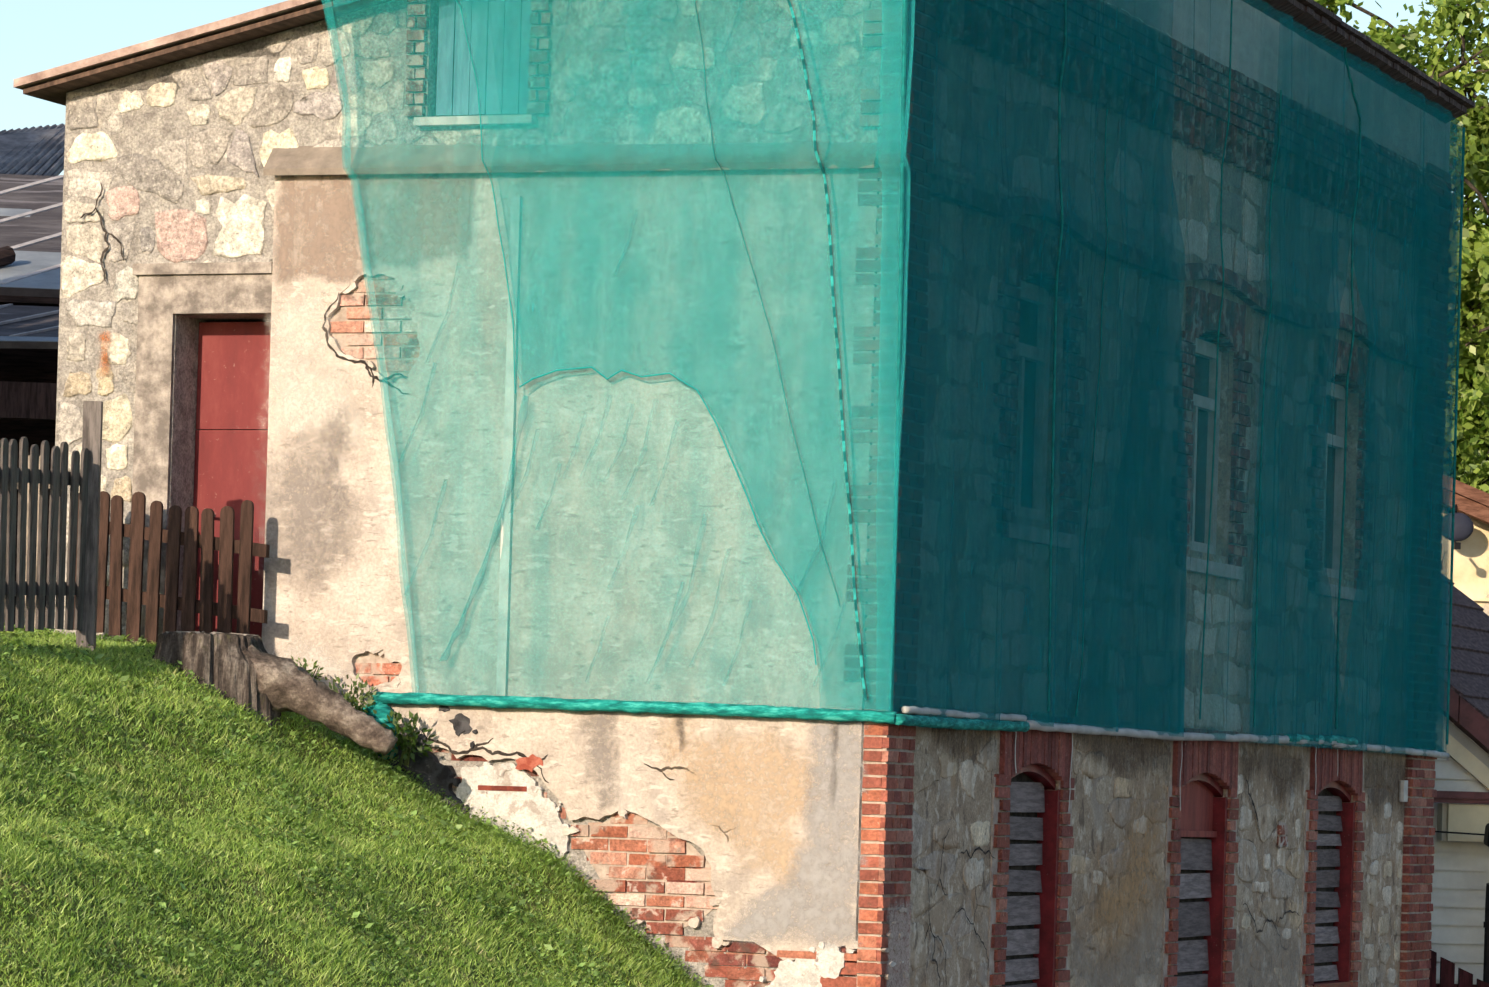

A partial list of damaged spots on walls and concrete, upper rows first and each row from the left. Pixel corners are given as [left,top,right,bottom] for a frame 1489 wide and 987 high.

flaking render [330,274,420,384]
water stain [275,425,349,578]
flaking render [280,642,402,688]
flaking render [446,727,858,987]
crack [924,828,994,987]